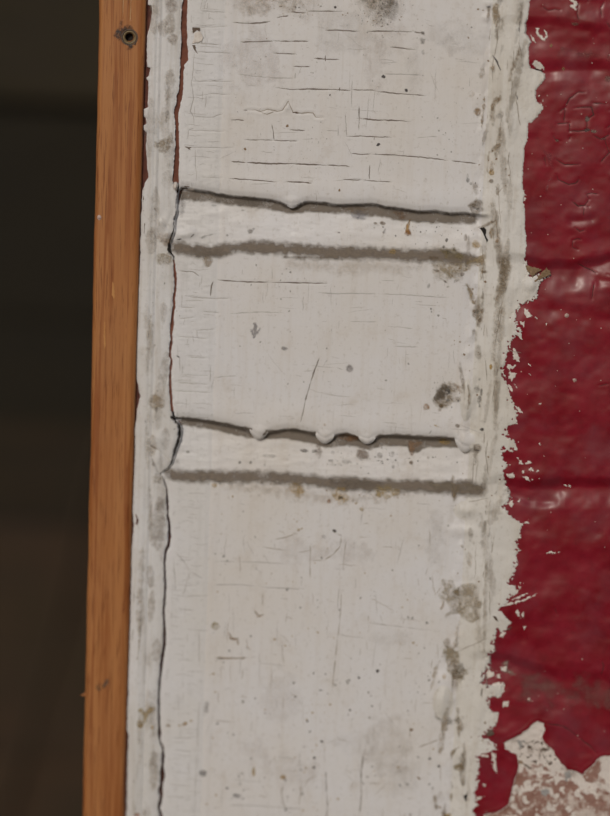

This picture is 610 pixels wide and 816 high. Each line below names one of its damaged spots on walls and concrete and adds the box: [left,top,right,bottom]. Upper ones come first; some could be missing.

crack [172,0,477,193]
crack [158,217,446,816]
peeling [481,667,509,736]
peeling [484,721,610,816]